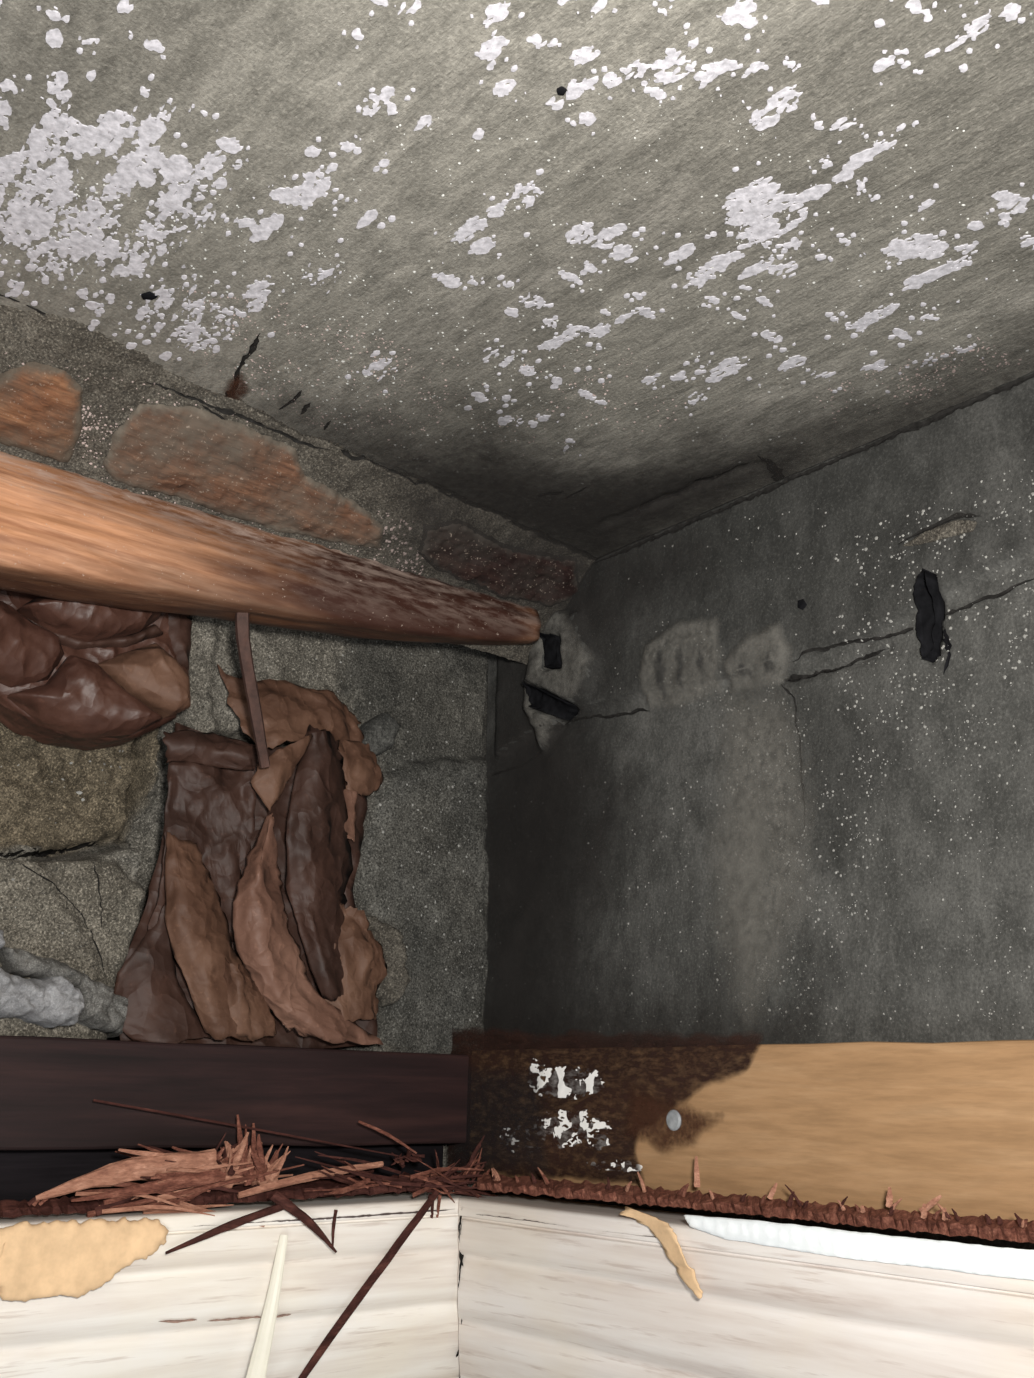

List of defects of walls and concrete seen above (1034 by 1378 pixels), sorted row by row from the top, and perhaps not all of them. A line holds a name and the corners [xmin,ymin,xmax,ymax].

crack [145,333,454,498]
spalling [539,633,562,669]
spalling [522,682,580,721]
crack [491,708,647,776]
crack [781,579,1034,827]
spalling [913,568,952,673]